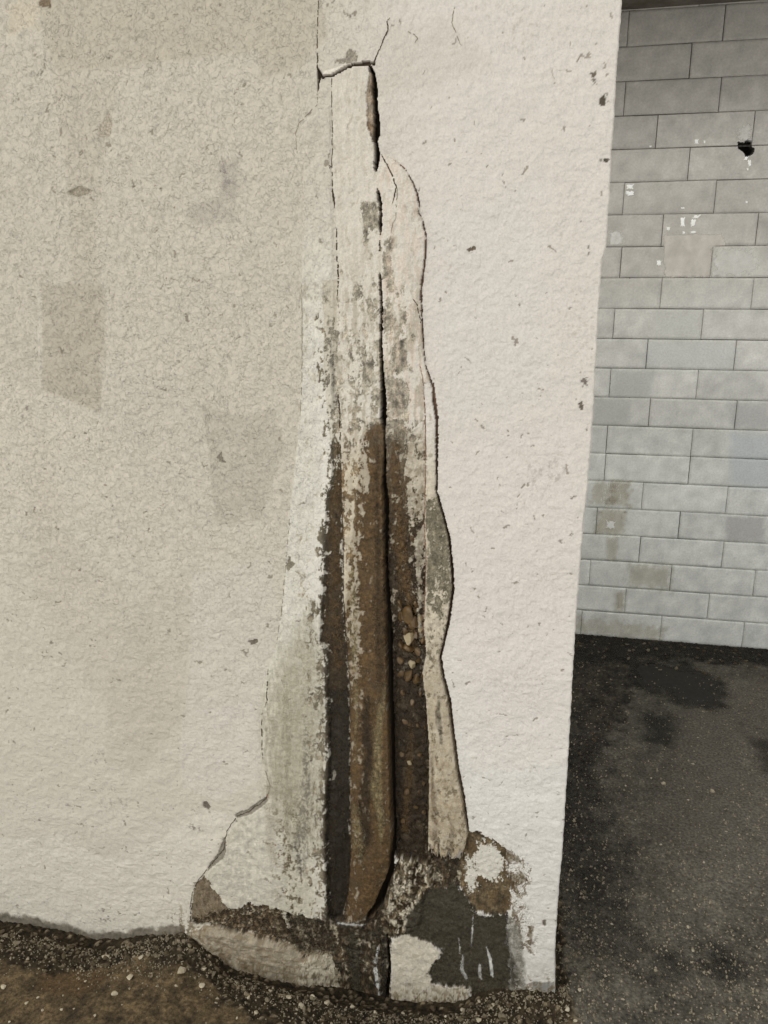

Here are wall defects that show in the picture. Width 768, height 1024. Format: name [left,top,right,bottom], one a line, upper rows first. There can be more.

crack [190,673,270,921]
water stain [194,424,527,996]
peeling [192,48,547,1003]
crack [295,0,469,829]
crack [367,456,397,917]